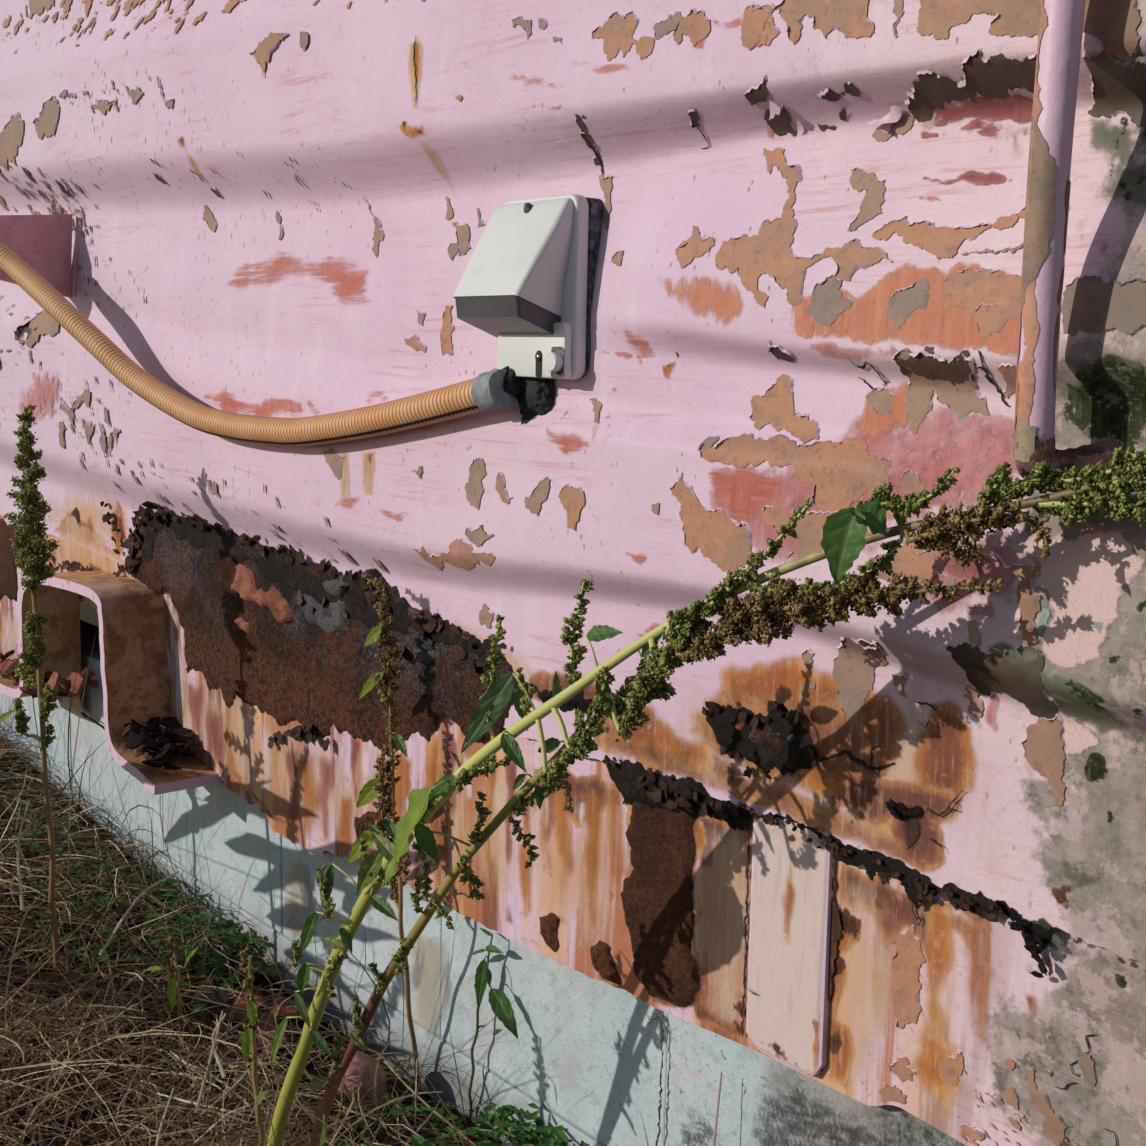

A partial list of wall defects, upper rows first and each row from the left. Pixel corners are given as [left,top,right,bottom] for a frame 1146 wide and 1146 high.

peeling [1,0,207,54]
peeling [591,8,710,61]
peeling [741,0,874,50]
peeling [867,48,1037,142]
peeling [916,0,1042,40]
peeling [1082,0,1146,127]
peeling [675,74,1025,337]
peeling [848,345,1017,434]
peeling [670,340,927,574]
rust [0,518,99,703]
peeling [870,541,955,586]
rust [41,498,1056,1109]